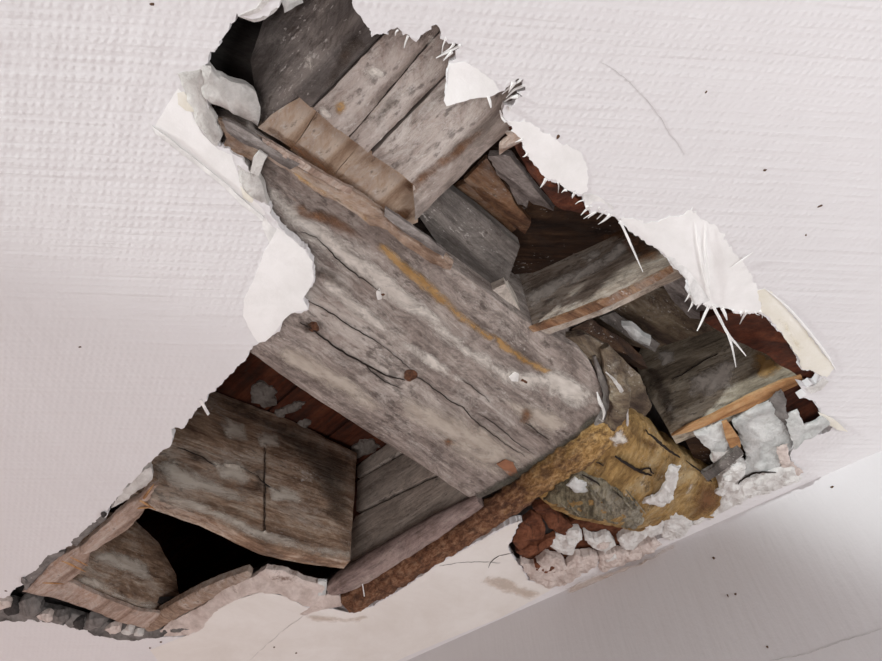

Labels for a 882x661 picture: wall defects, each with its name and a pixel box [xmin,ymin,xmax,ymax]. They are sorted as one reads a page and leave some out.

flaking render [155,69,272,216]
flaking render [238,0,303,22]
peeling [444,62,500,106]
flaking render [243,227,313,342]
peeling [507,120,834,394]
flaking render [0,458,802,661]